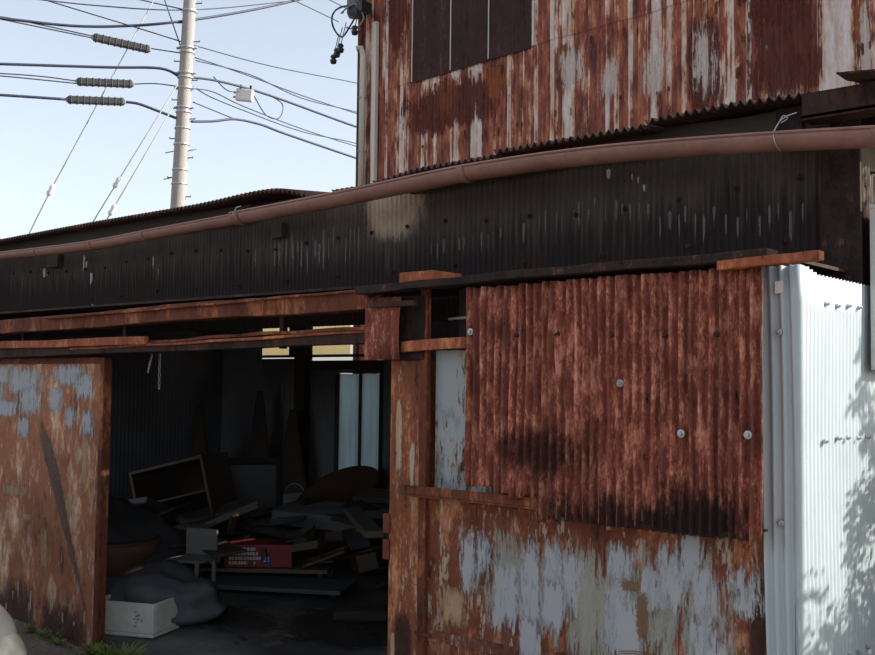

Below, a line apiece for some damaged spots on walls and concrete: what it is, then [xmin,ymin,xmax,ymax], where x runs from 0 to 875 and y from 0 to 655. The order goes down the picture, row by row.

rust [383,0,410,67]
rust [401,62,505,148]
rust [554,43,570,84]
rust [687,0,724,110]
rust [736,0,822,98]
peeling [0,364,95,487]
rust [394,615,410,655]
peeling [436,524,765,655]